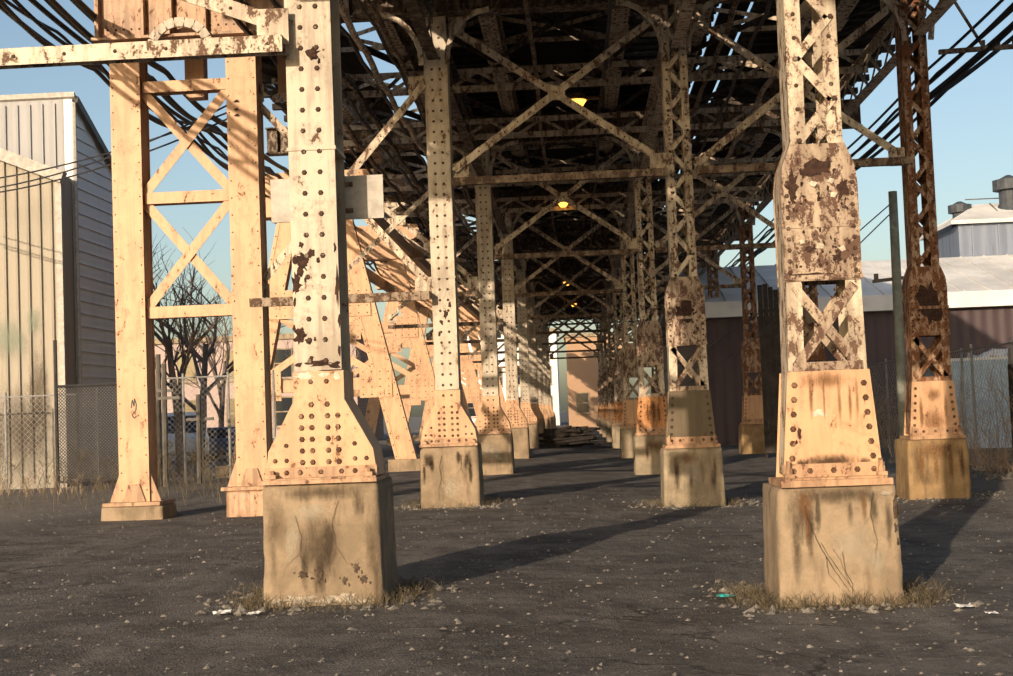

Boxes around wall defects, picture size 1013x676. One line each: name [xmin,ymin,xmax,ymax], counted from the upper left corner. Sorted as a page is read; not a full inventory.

peeling [785,157,849,213]
water stain [797,491,854,540]
water stain [302,531,332,586]